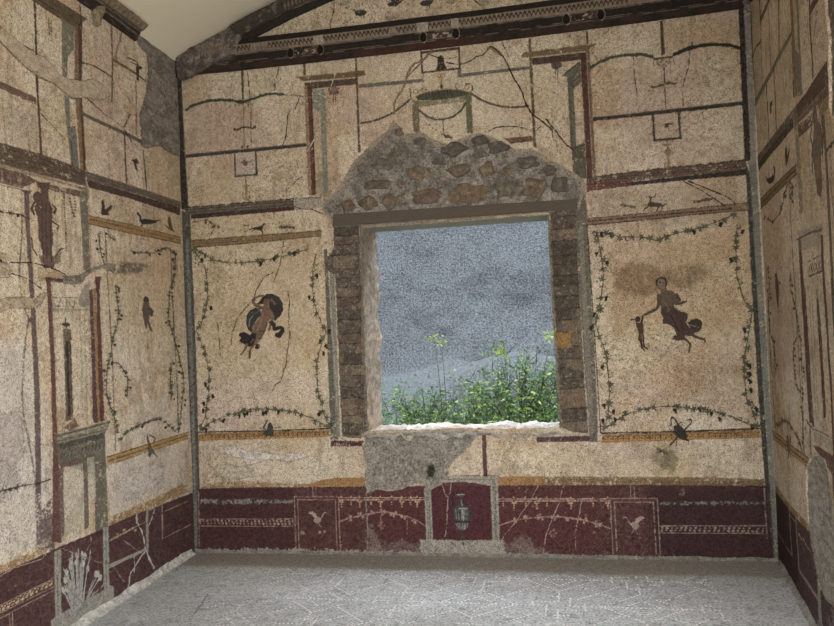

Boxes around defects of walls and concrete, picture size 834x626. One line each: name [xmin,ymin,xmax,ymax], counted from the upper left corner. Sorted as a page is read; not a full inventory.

flaking render [137,28,242,156]
crack [393,42,572,151]
flaking render [322,121,588,493]
flaking render [807,455,834,607]